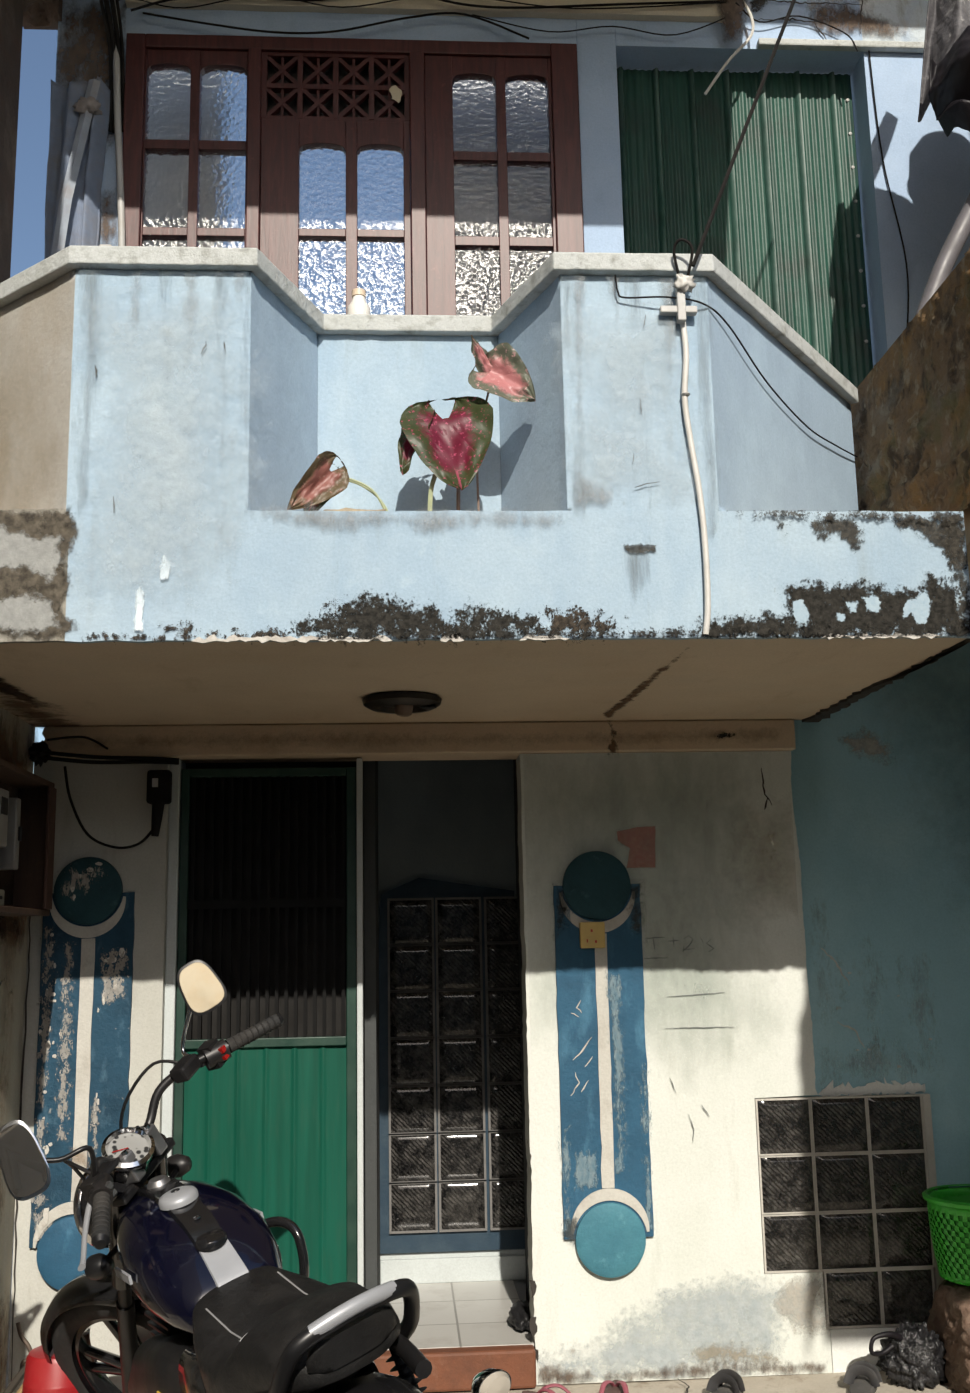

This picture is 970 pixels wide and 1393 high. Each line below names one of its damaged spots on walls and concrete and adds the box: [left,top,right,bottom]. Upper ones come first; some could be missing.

damp [750,0,768,12]
flaking render [0,525,61,580]
damp [0,510,970,646]
flaking render [0,594,58,636]
peeling [0,678,36,708]